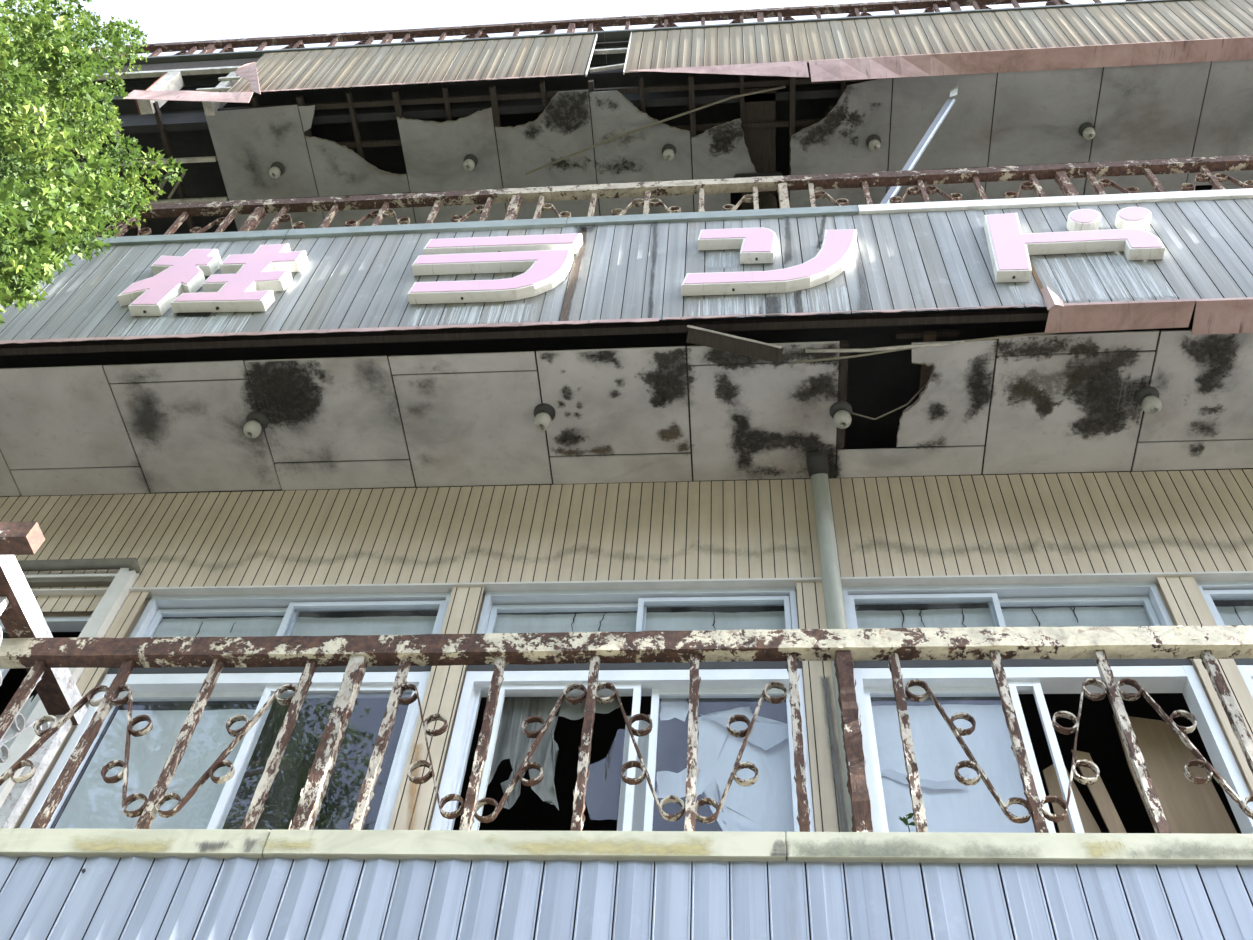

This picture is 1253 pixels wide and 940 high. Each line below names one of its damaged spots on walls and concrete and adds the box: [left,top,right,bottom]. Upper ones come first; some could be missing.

water stain [525,91,617,139]
water stain [551,158,635,174]
water stain [707,121,744,156]
water stain [791,86,880,151]
water stain [244,361,332,441]
water stain [555,387,583,446]
water stain [590,350,621,398]
water stain [705,344,841,404]
water stain [931,404,946,419]
water stain [968,339,1151,439]
water stain [1182,334,1238,456]